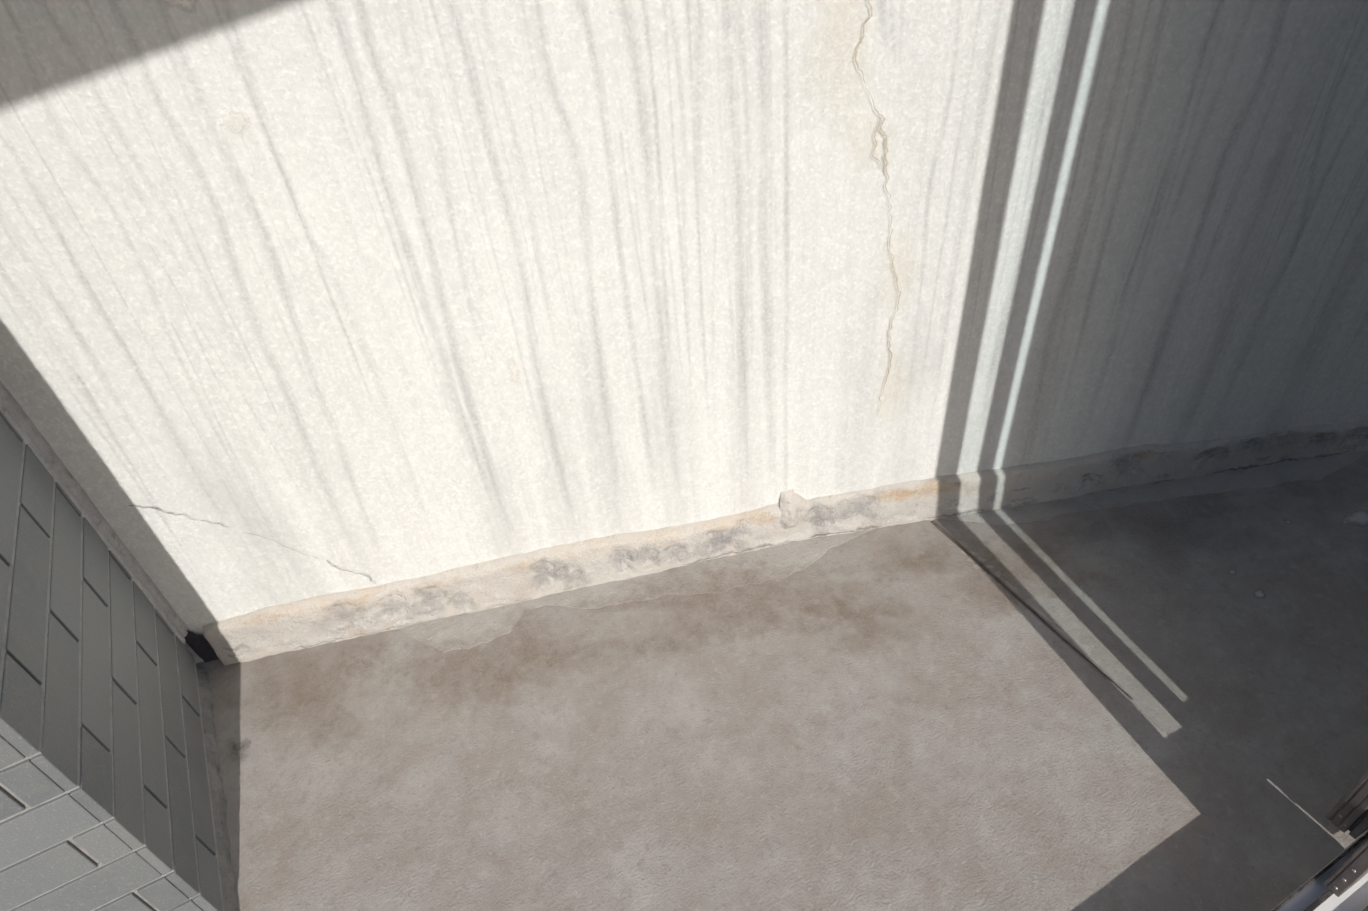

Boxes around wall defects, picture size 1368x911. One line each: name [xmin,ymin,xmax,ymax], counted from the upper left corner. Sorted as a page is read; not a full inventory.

crack [855,1,901,390]